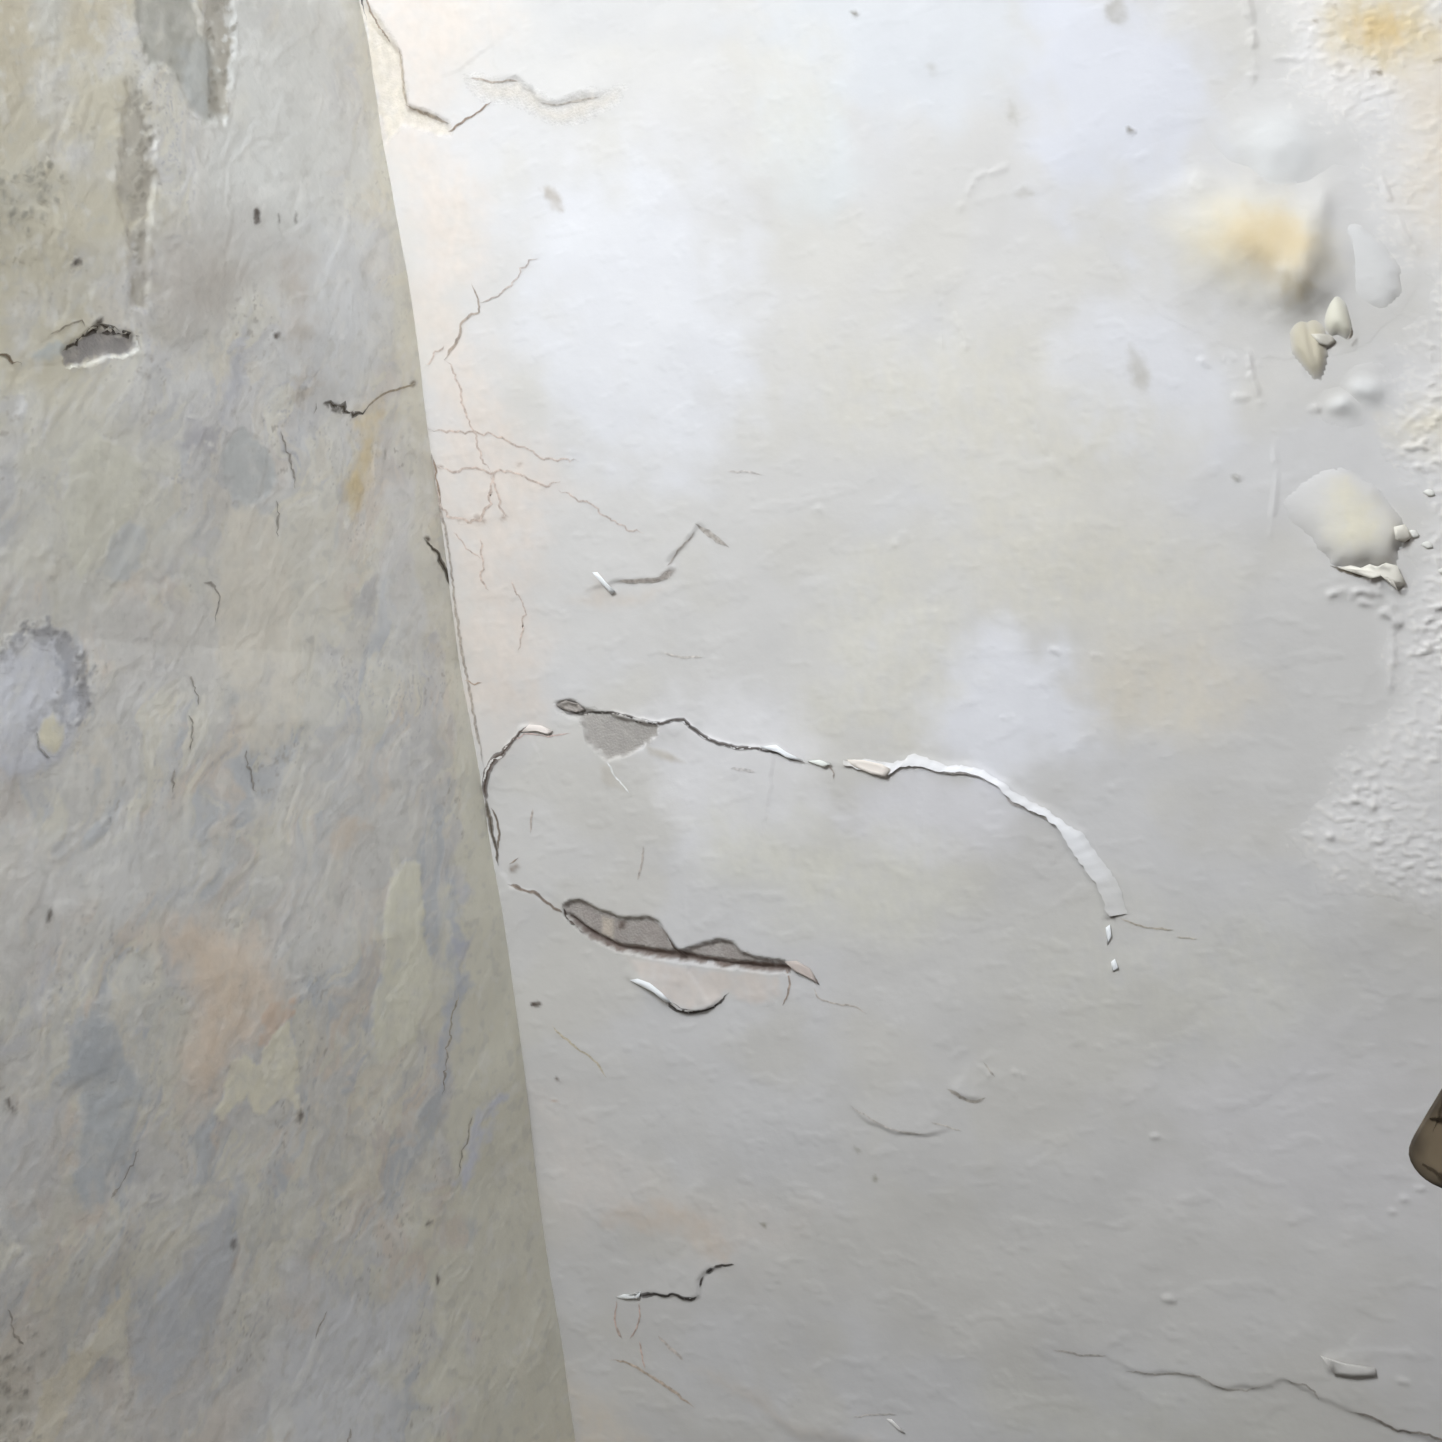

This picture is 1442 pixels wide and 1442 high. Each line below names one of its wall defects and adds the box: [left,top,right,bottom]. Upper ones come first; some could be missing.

crack [361,0,390,42]
crack [448,102,491,132]
crack [0,353,22,365]
crack [276,432,296,536]
crack [314,258,1197,971]
peeling [0,614,100,802]
flaking render [553,698,688,797]
flaking render [561,898,865,1015]
crack [614,1264,734,1408]
crack [1055,1350,1319,1400]
crack [1351,1412,1442,1441]